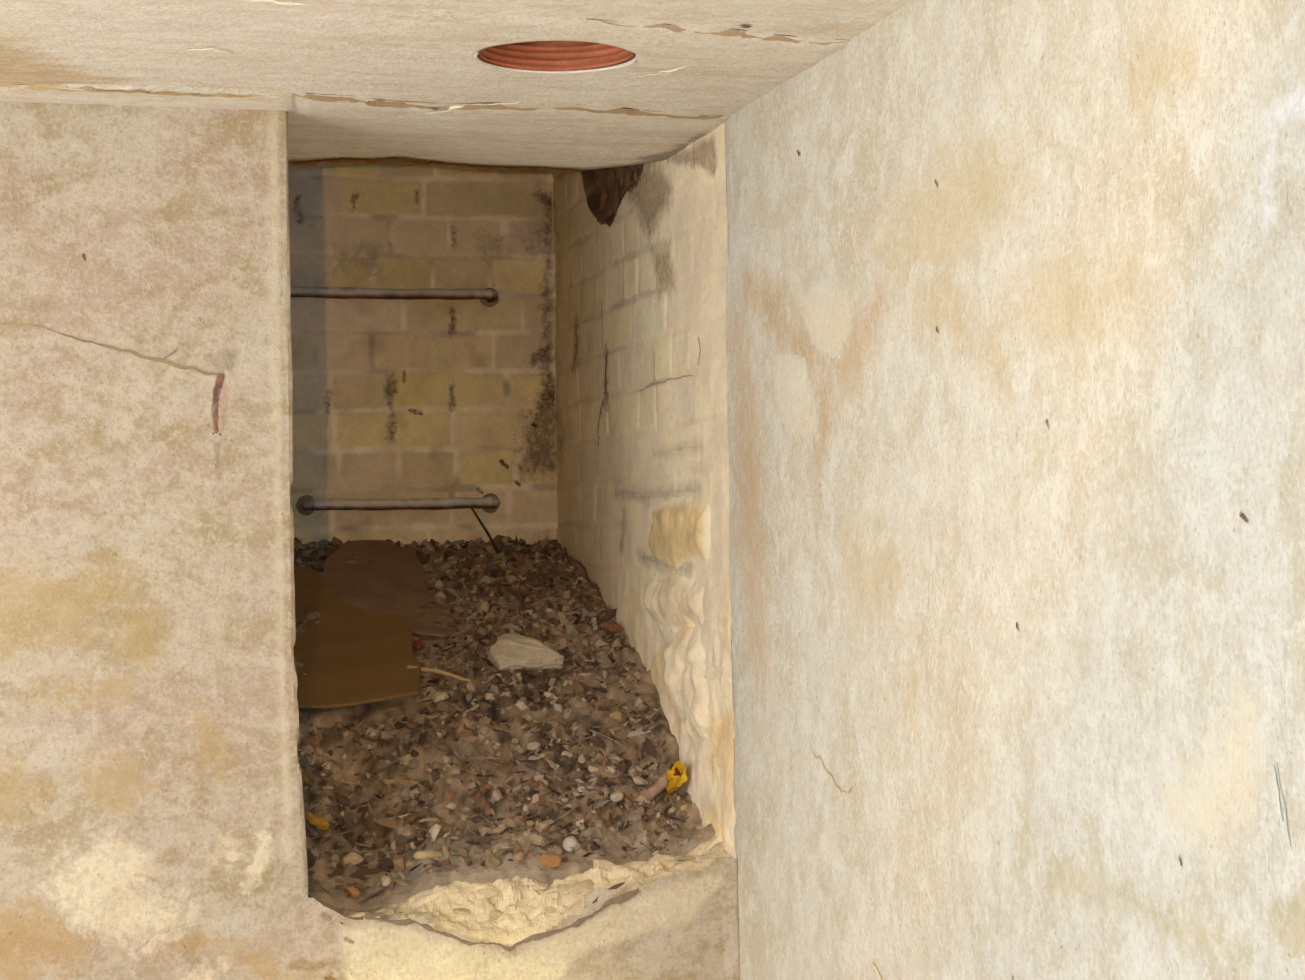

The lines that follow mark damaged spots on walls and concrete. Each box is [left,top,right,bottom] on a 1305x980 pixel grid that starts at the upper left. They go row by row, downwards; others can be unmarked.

spalling [580,164,644,227]
water stain [627,134,715,234]
crack [0,323,218,375]
corrosion [212,354,232,463]
water stain [500,289,556,486]
peeling [308,835,733,980]